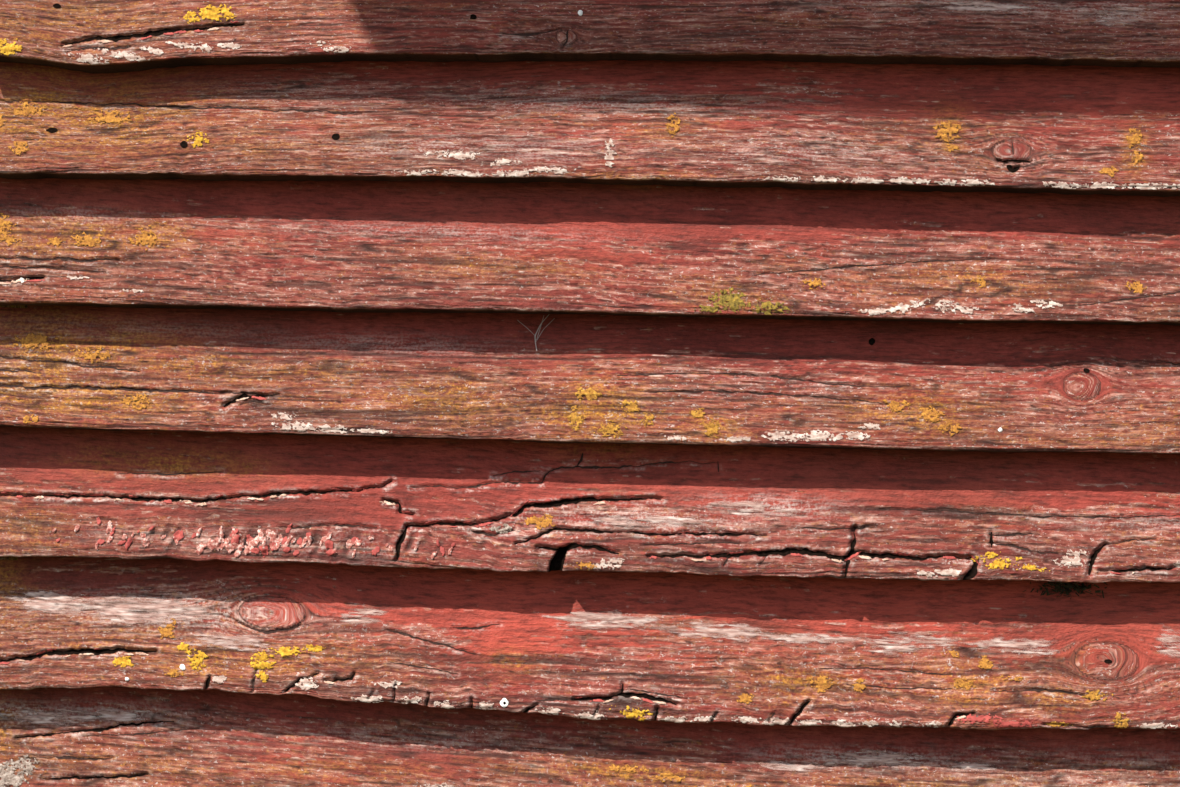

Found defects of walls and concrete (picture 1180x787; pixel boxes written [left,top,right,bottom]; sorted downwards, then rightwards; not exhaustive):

crack [63,21,244,51]
crack [1,453,1180,580]
crack [0,648,156,664]
crack [523,683,681,720]